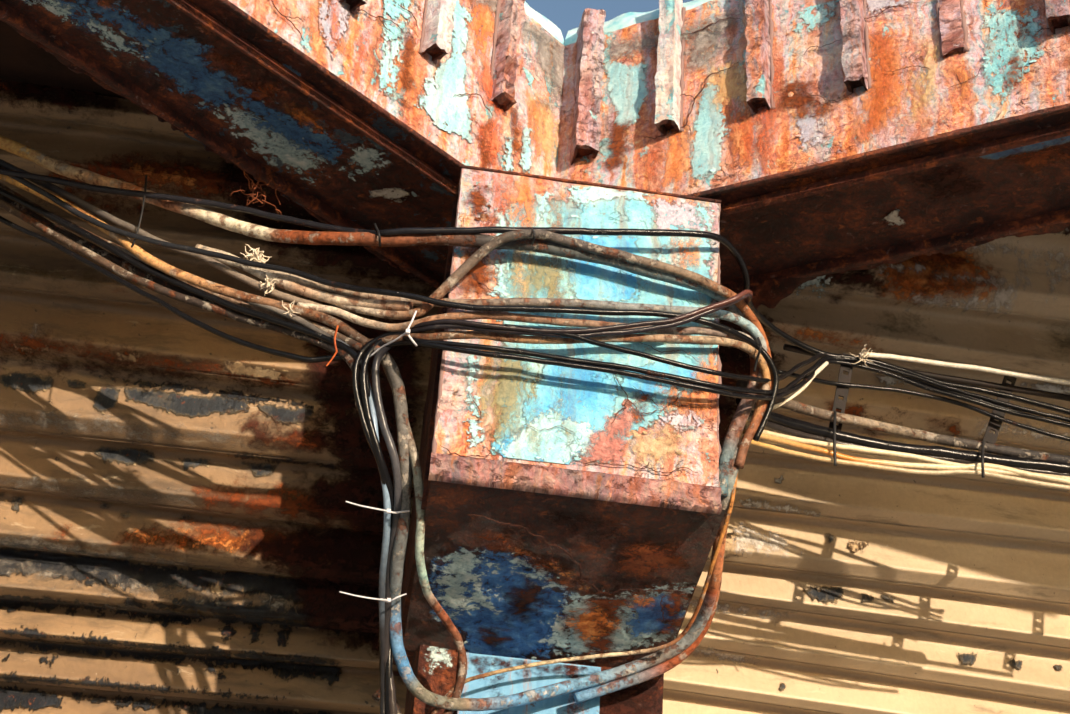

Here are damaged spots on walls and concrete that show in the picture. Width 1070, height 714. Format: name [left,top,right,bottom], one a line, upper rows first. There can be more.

peeling [23,0,391,184]
corrosion [48,153,437,294]
peeling [465,185,717,281]
peeling [0,360,314,425]
corrosion [309,298,419,339]
peeling [461,249,718,466]
corrosion [667,308,750,448]
corrosion [0,333,427,655]
peeling [0,536,342,714]
peeling [427,546,695,664]
corrosion [471,530,692,679]
corrosion [603,679,656,714]